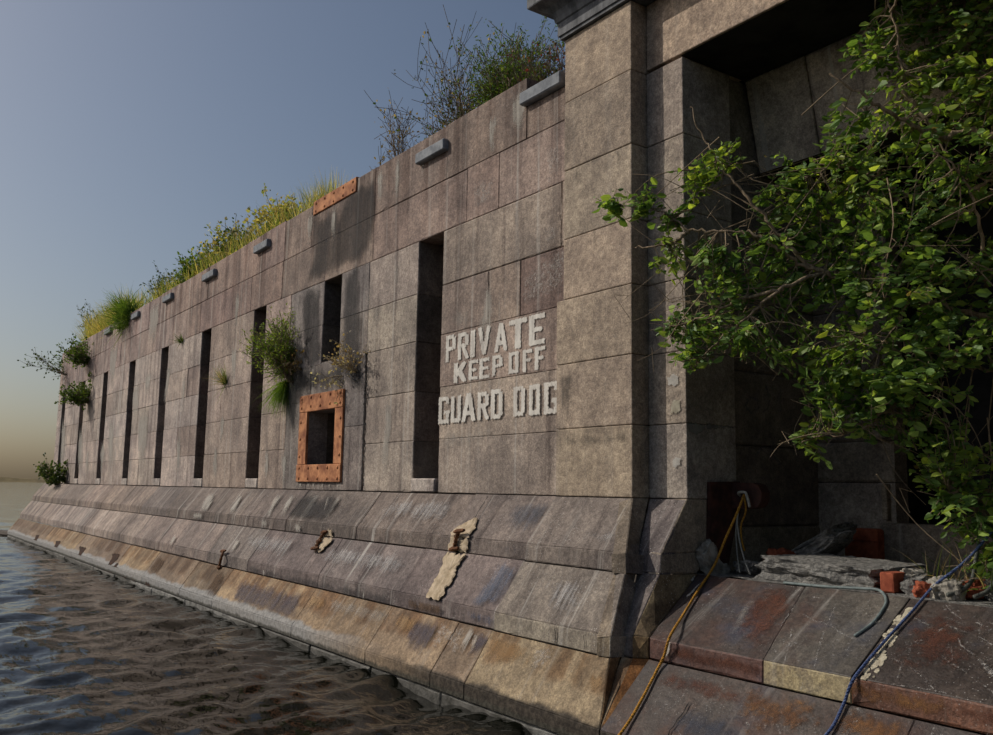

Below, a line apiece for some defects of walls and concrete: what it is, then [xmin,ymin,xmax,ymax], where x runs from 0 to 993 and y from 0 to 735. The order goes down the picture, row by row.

leakage [335,270,359,382]
spalling [314,528,333,553]
spalling [426,517,478,601]